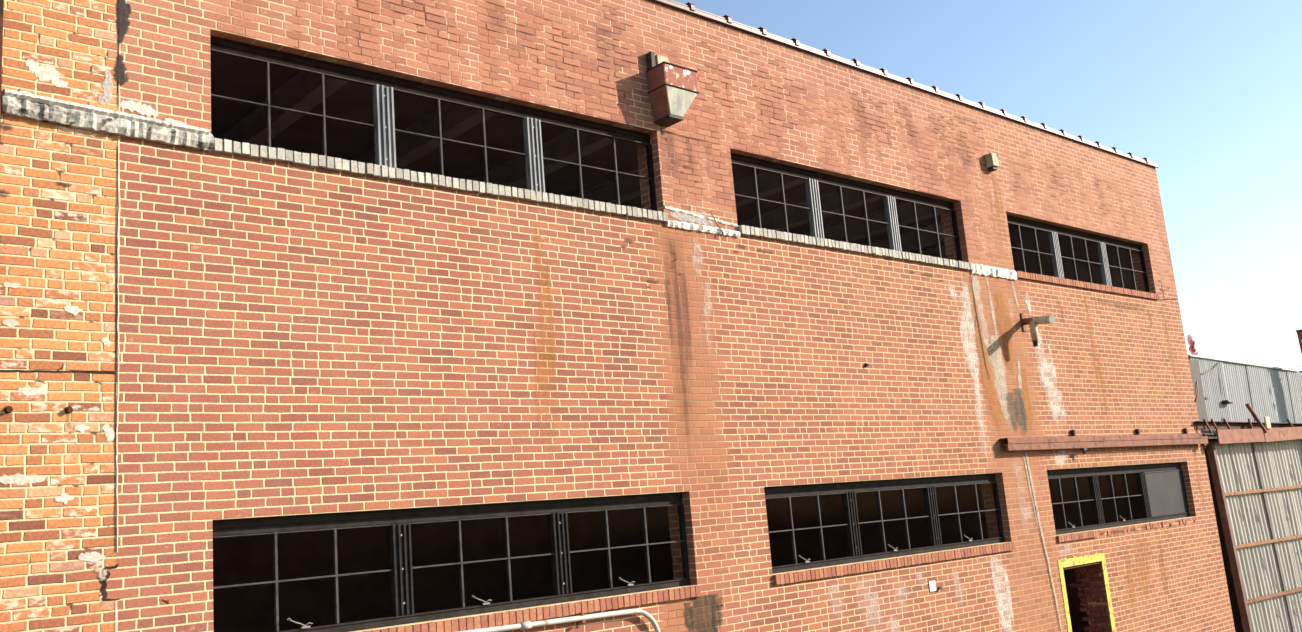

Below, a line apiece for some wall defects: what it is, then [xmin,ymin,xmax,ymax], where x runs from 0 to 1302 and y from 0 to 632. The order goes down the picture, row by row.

peeling [99,70,191,126]
rust [970,289,999,420]
damp [950,281,1027,429]
rust [997,295,1013,360]
damp [1037,333,1064,415]